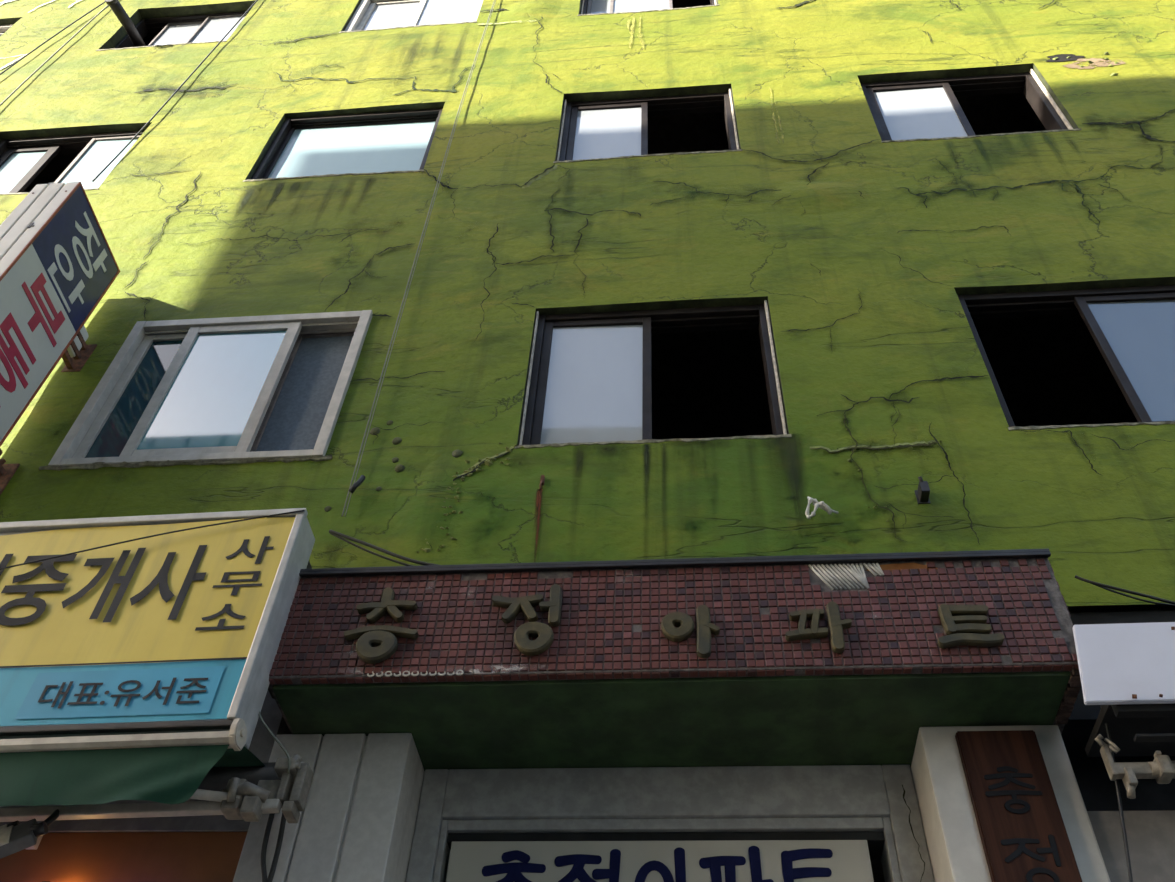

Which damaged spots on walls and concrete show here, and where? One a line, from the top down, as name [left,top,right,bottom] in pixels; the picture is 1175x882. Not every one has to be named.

crack [533,17,562,93]
leakage [240,189,254,208]
crack [891,109,1175,286]
crack [123,170,411,320]
crack [424,139,879,339]
crack [780,291,862,350]
crack [350,371,444,382]
crack [810,375,988,544]
crack [1016,428,1171,475]